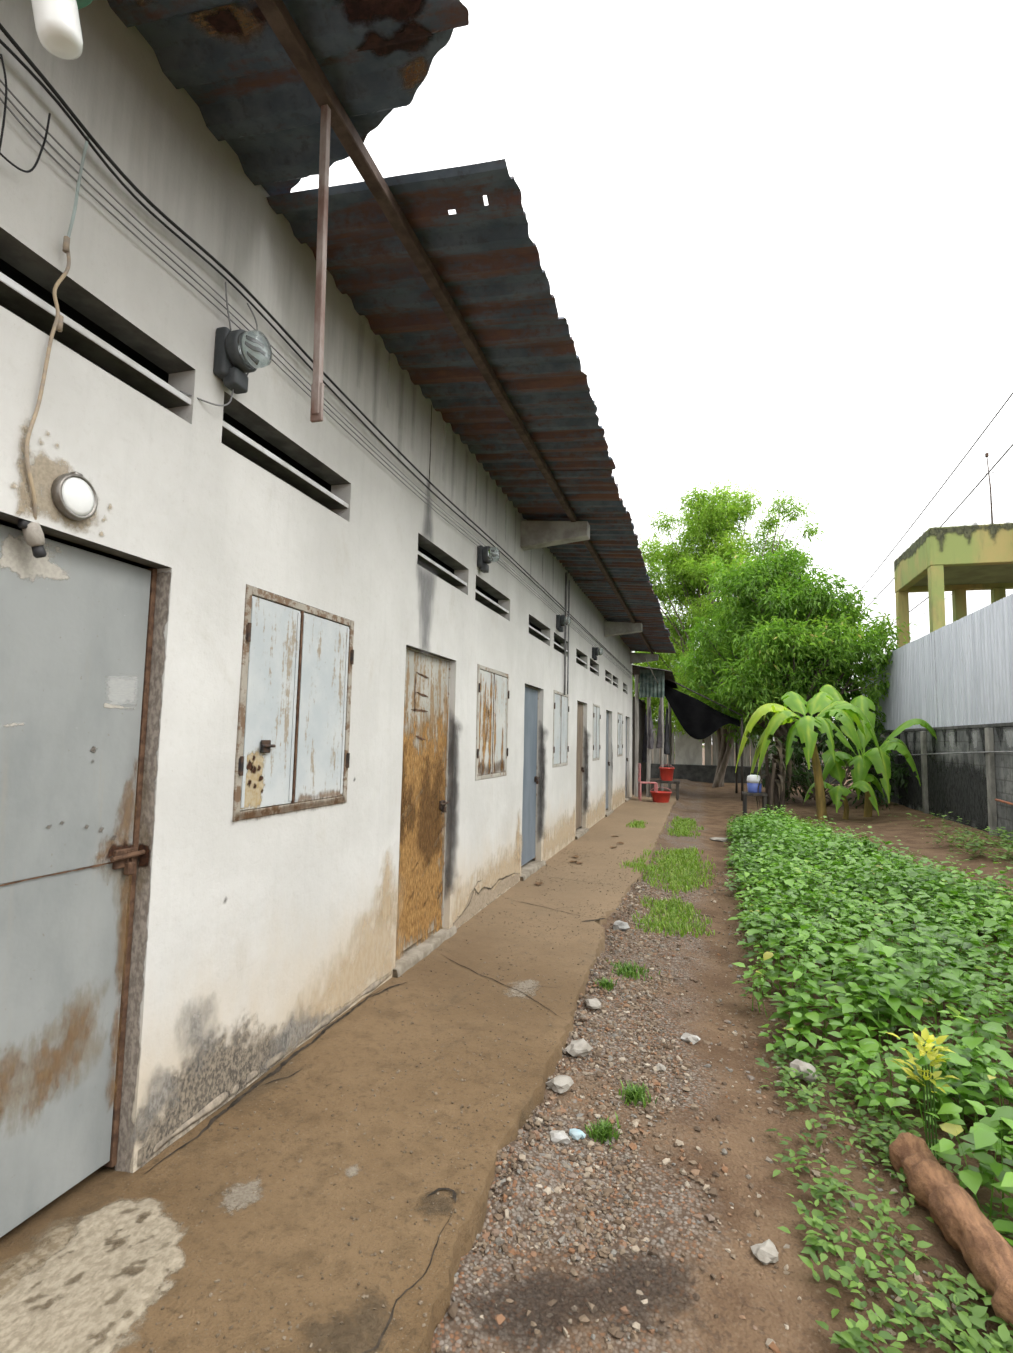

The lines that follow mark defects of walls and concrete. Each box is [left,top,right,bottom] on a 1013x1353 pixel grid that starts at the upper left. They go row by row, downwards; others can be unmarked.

corrosion [190,4,267,43]
corrosion [336,0,433,88]
flaking render [11,425,112,536]
corrosion [478,676,505,774]
corrosion [235,751,345,821]
corrosion [396,672,448,959]
leakage [133,1014,318,1168]
peeling [26,1273,83,1309]
peeling [88,1312,132,1344]
peeling [106,1234,153,1305]
crack [362,1211,453,1353]